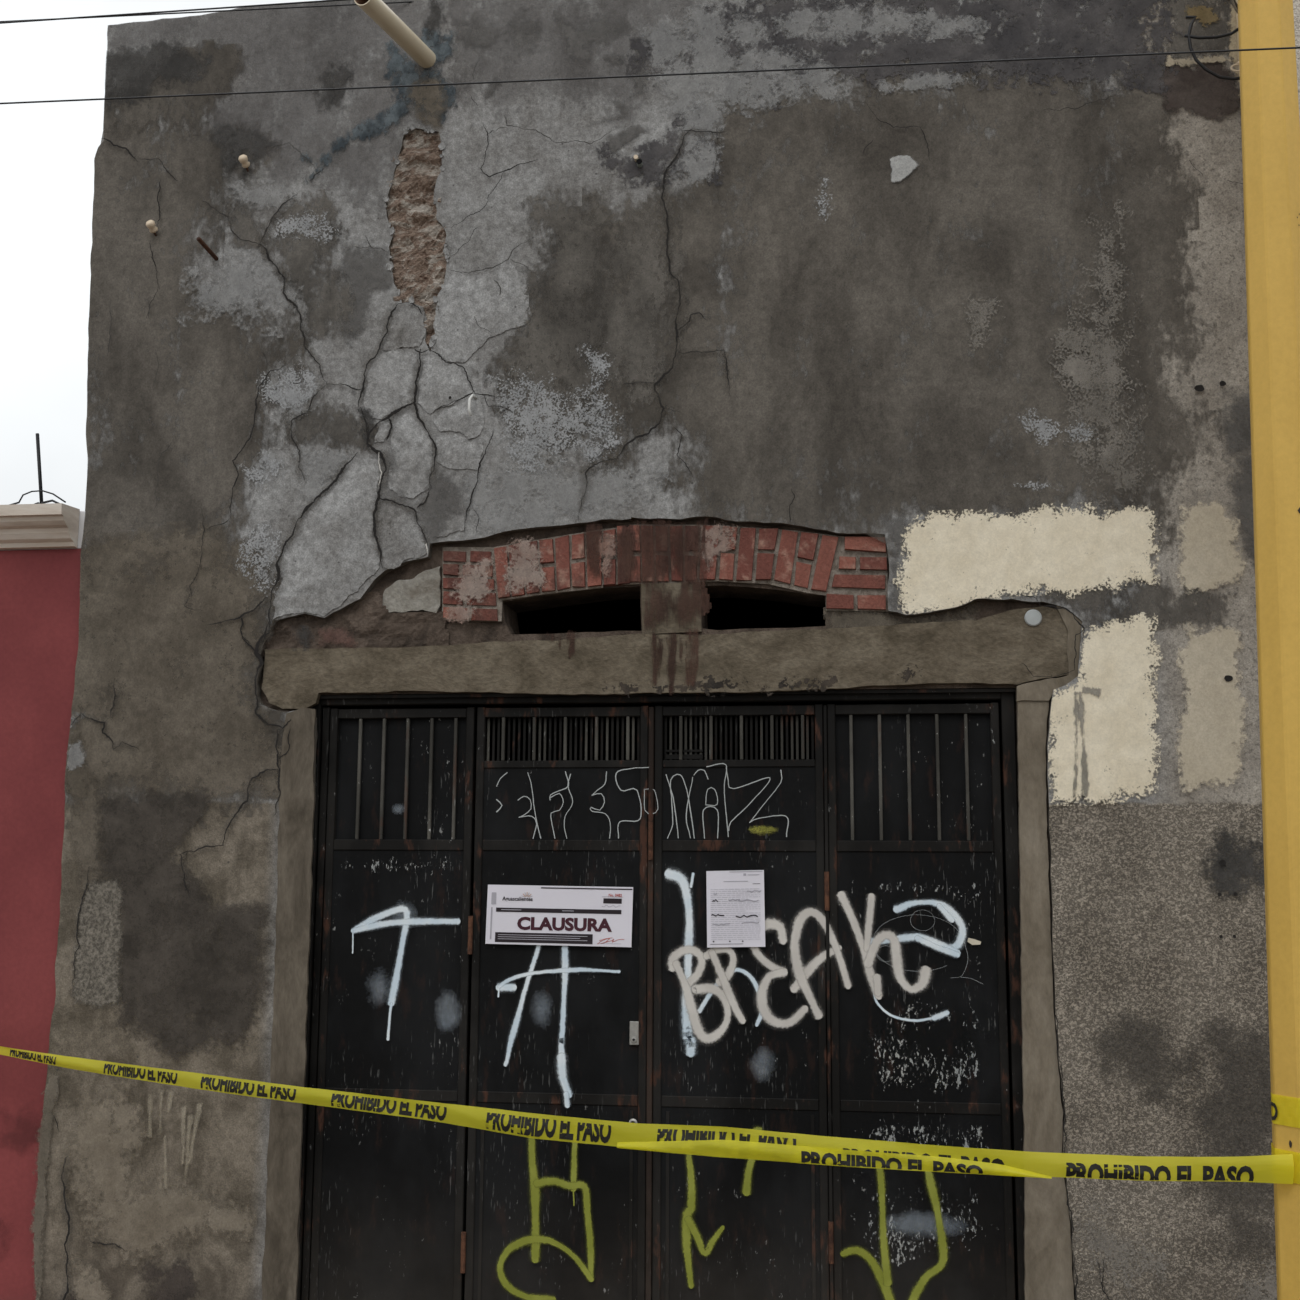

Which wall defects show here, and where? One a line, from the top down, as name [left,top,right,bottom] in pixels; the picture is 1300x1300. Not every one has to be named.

crack [101,138,178,318]
spalling [383,125,450,350]
crack [451,59,615,293]
crack [578,123,730,521]
crack [179,142,512,895]
flaking render [598,532,617,576]
corrosion [584,517,712,694]
water stain [64,0,1255,1059]
flaking render [700,519,736,571]
peeling [893,502,1160,615]
peeling [1048,612,1247,806]